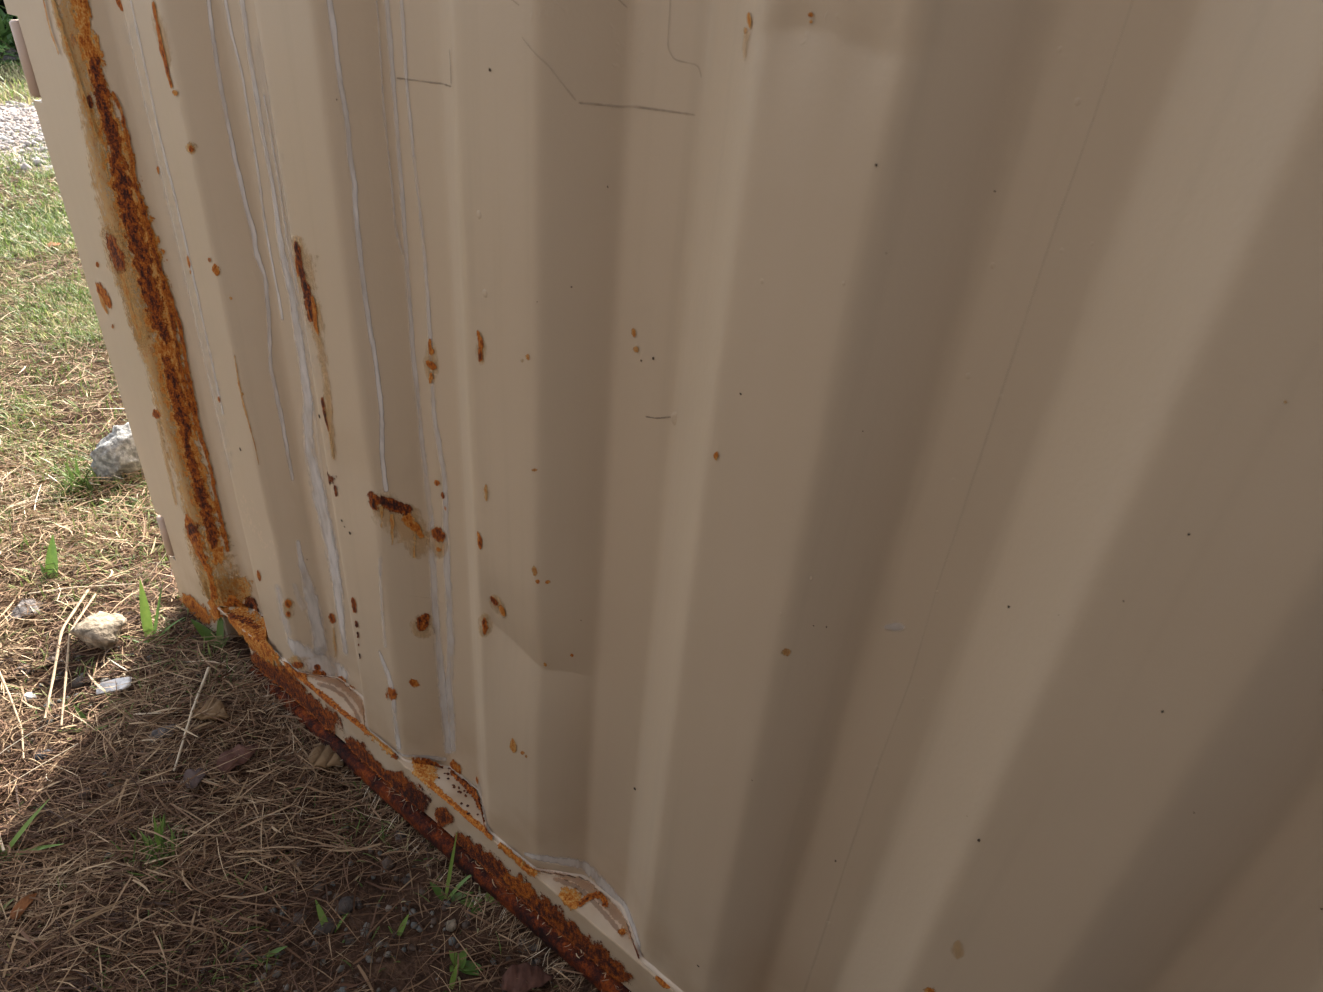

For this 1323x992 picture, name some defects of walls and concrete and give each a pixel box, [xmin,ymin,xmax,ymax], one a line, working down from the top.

water stain [207,0,347,680]
corrosion [43,0,640,985]
water stain [327,0,388,492]
water stain [396,402,455,761]